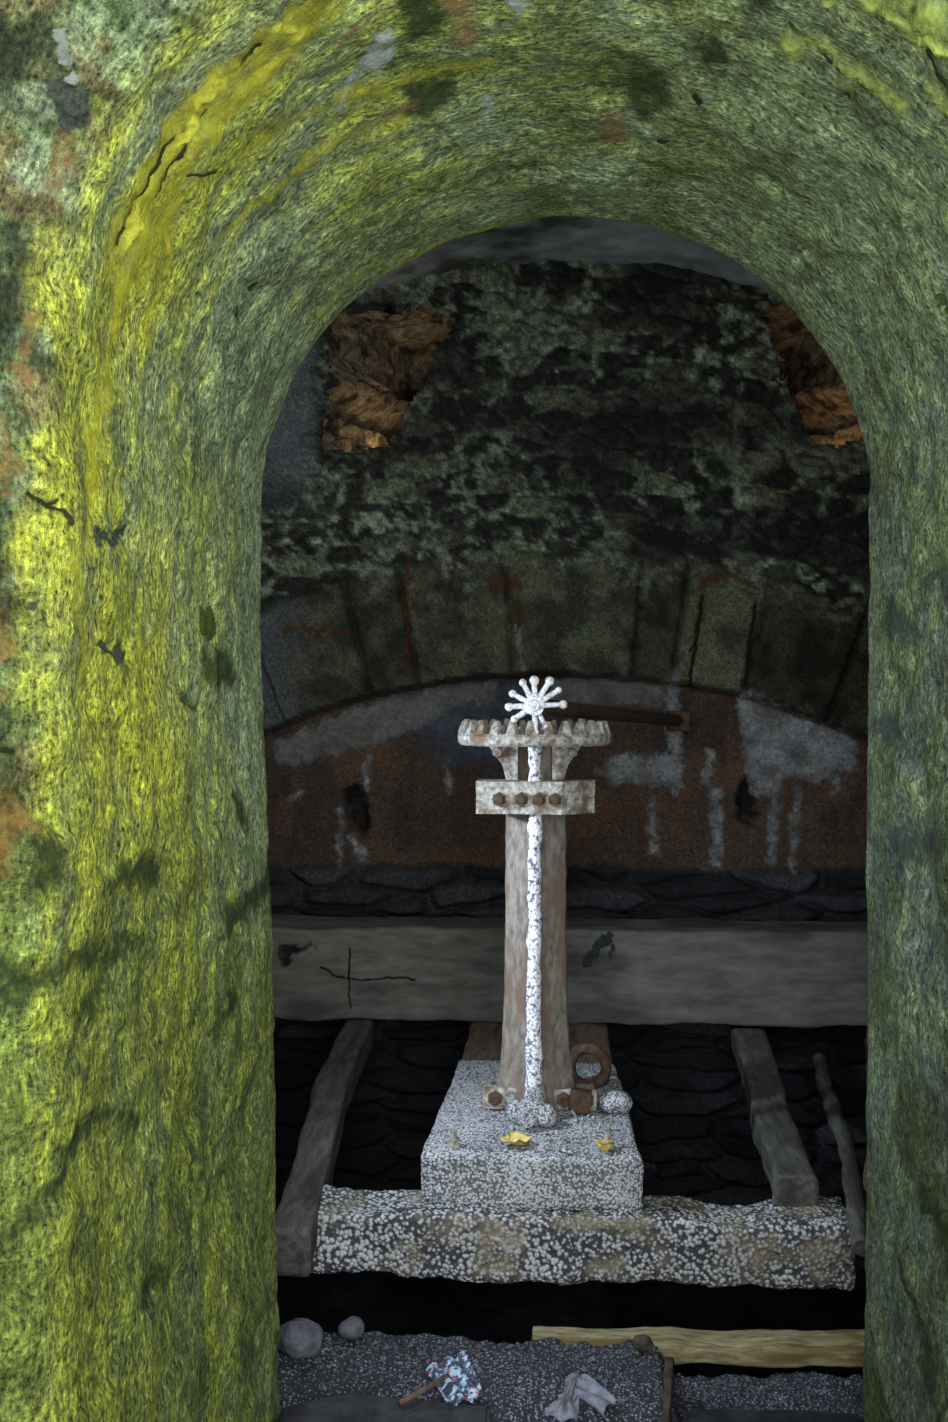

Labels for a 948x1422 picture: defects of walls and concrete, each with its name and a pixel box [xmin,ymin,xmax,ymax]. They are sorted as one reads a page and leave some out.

crack [788,23,878,94]
crack [898,0,948,97]
crack [116,42,262,246]
water stain [608,730,685,795]
water stain [702,749,724,867]
water stain [738,691,856,873]